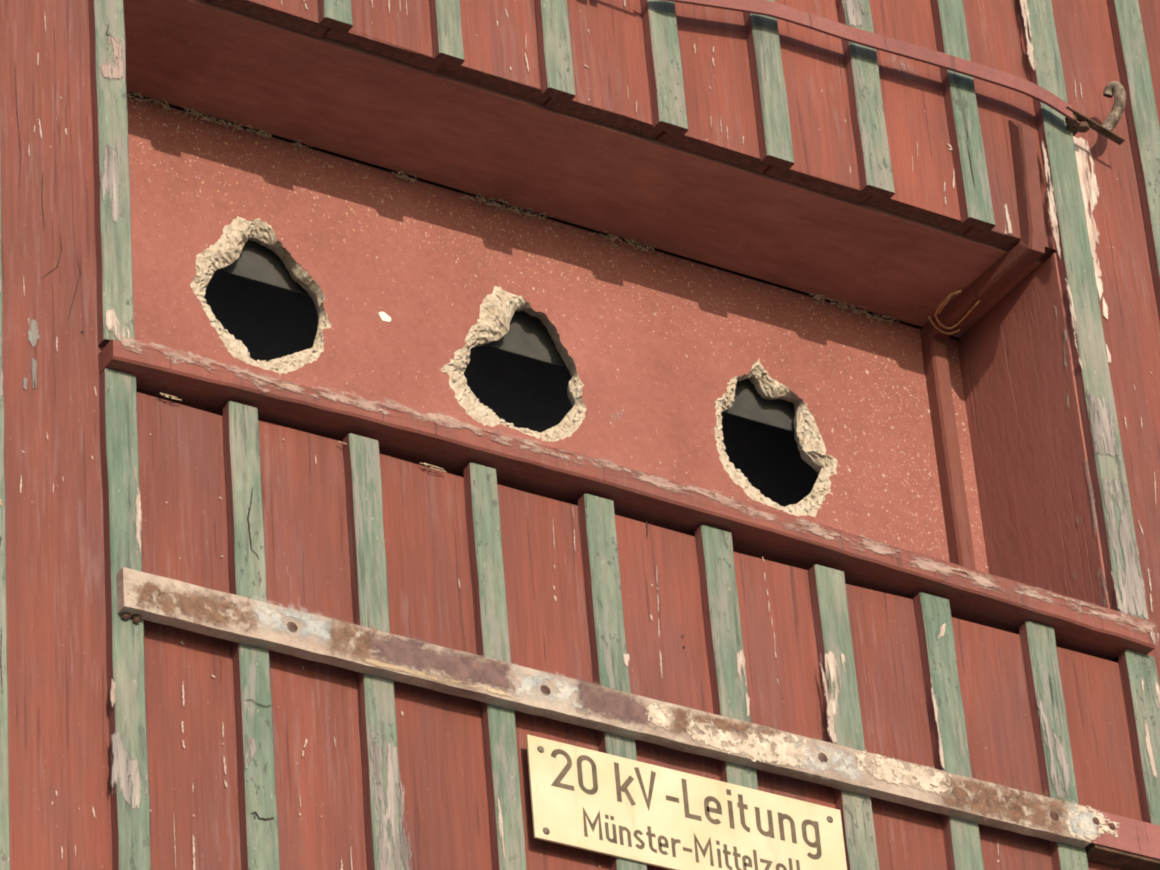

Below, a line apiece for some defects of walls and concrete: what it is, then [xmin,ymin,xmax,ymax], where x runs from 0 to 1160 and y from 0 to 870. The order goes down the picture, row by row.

peeling [1020,0,1036,70]
peeling [1042,142,1061,256]
peeling [106,216,1159,643]
corrosion [137,583,257,627]
corrosion [329,620,515,690]
corrosion [578,679,651,724]
corrosion [673,708,780,735]
peeling [820,651,845,743]
peeling [111,732,148,809]
peeling [370,726,412,870]
corrosion [945,777,1065,832]